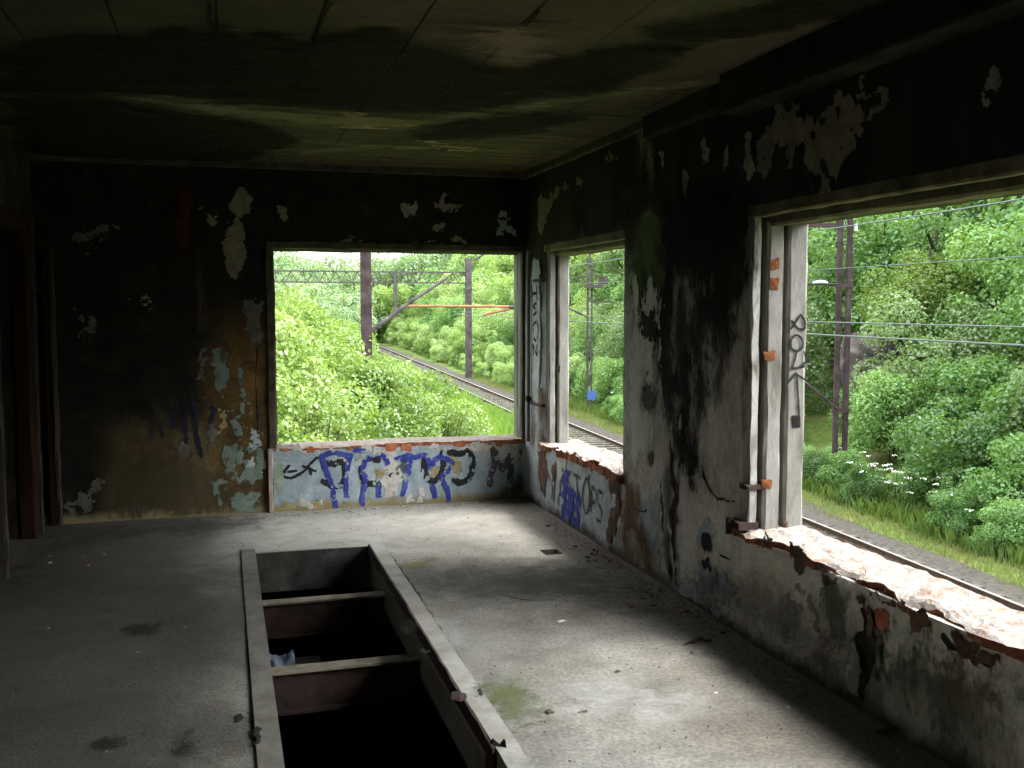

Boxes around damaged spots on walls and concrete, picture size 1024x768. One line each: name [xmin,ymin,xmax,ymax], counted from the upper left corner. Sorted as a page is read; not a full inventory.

damp [111,93,501,130]
peeling [743,73,890,203]
peeling [198,185,253,279]
peeling [400,201,418,218]
peeling [411,192,468,244]
peeling [537,177,583,236]
damp [625,208,735,489]
peeling [195,346,523,513]
peeling [63,478,106,516]
peeling [537,446,661,569]
peeling [759,530,932,647]
flaking render [950,629,1003,670]